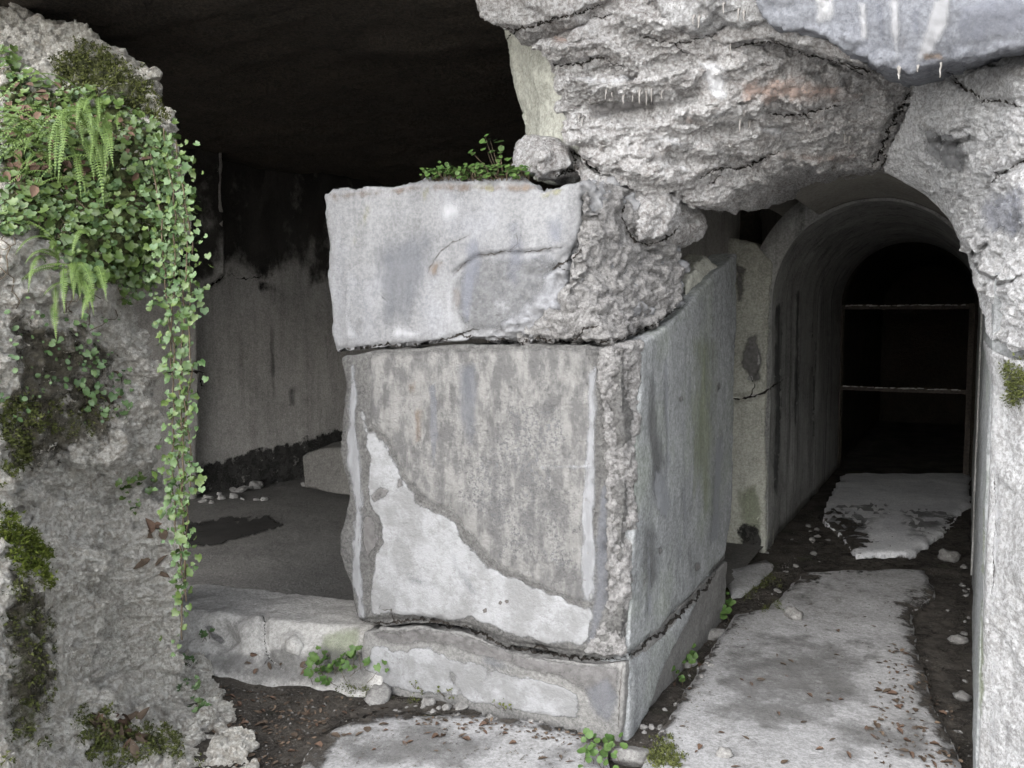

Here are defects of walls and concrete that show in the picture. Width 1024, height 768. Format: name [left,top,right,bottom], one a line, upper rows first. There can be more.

crack [872,93,911,167]
crack [427,235,586,277]
crack [733,376,781,400]
peeling [368,181,685,707]
leakage [737,524,761,553]
crack [365,571,716,725]